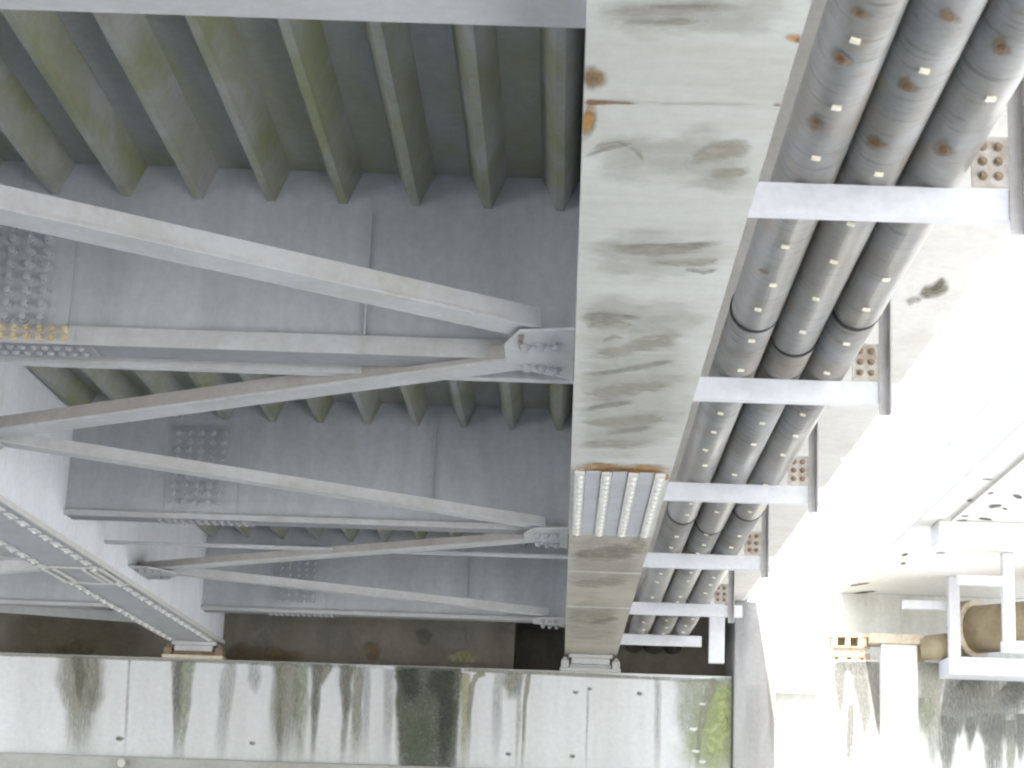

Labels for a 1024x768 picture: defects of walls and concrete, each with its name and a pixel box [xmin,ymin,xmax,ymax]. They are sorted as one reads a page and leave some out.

rust [993,39,1010,54]
rust [585,72,604,87]
rust [899,77,918,92]
rust [583,107,596,131]
water stain [622,244,716,274]
water stain [591,314,671,357]
water stain [591,361,667,448]
rust [584,463,669,480]
water stain [0,618,379,741]
water stain [388,628,690,753]